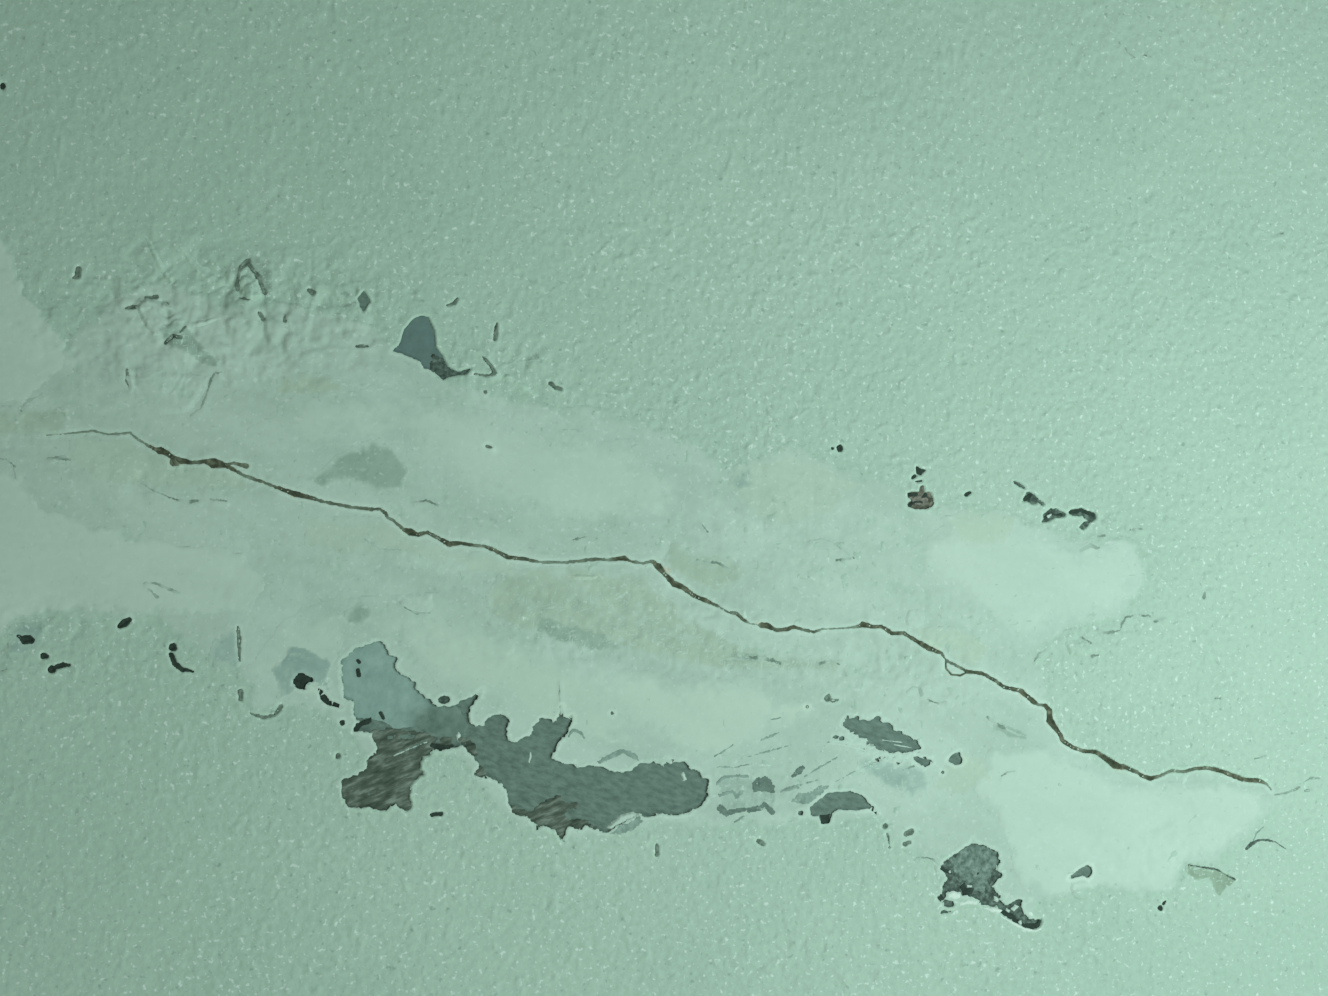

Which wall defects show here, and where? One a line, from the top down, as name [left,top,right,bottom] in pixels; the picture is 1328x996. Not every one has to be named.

peeling [393,316,470,380]
peeling [1013,481,1096,530]
crack [46,430,1321,795]
peeling [293,641,962,849]
peeling [937,844,1042,932]